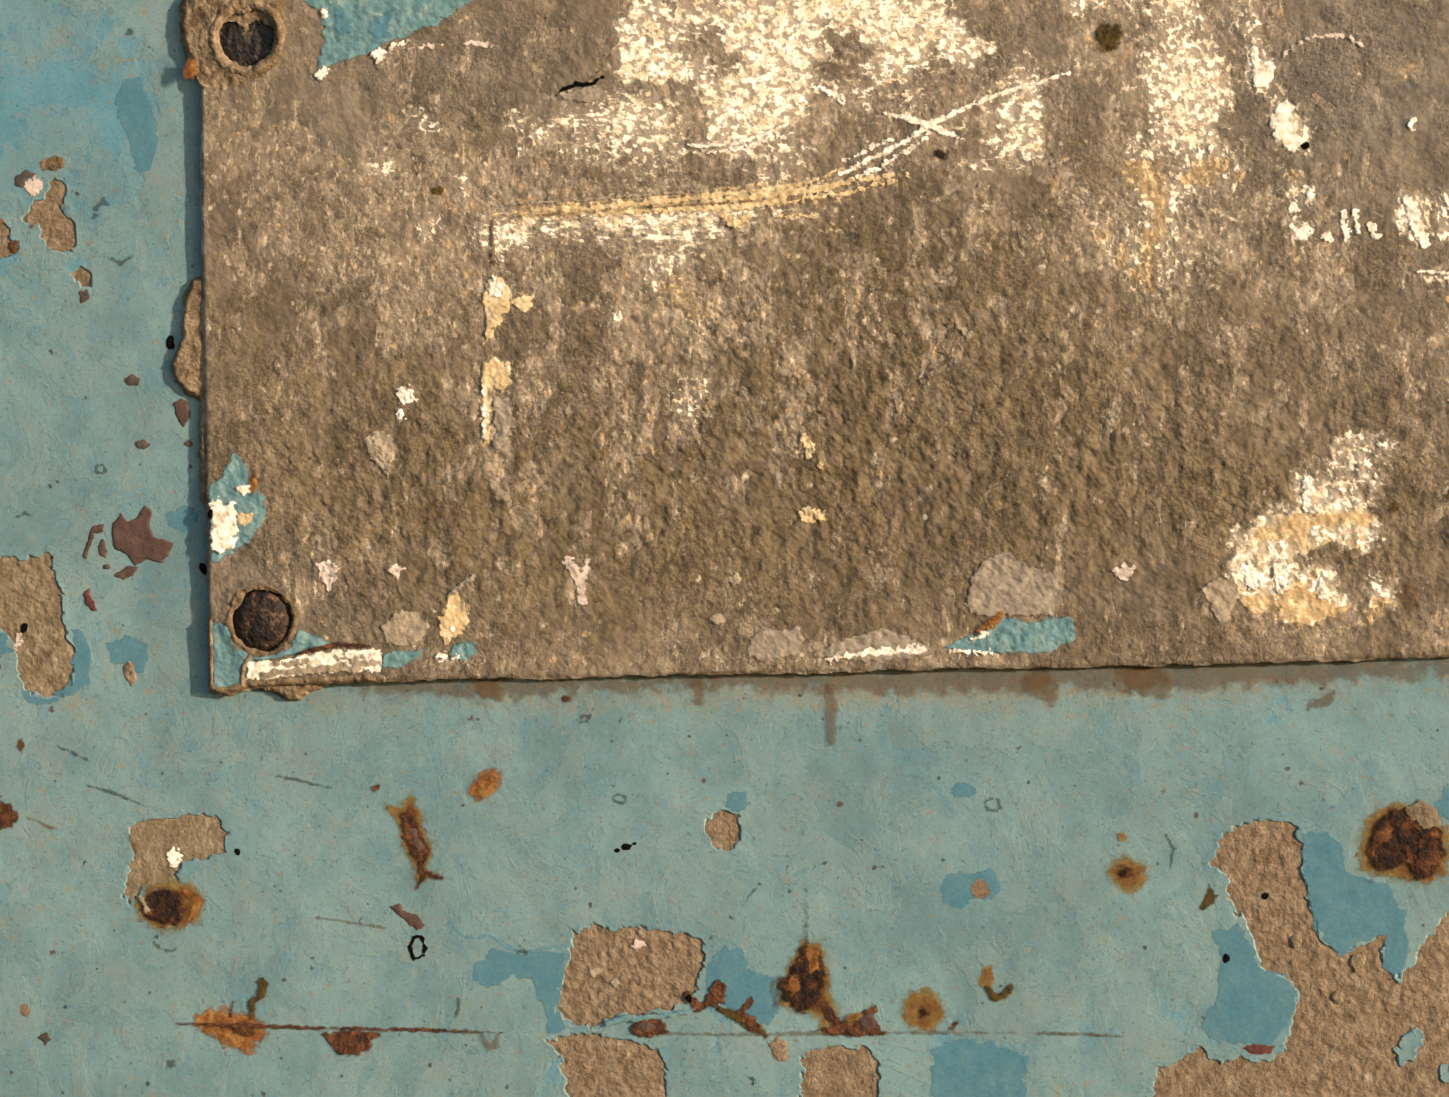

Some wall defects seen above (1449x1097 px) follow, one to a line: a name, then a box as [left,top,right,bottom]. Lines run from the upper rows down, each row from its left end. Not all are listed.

peeling [371,40,444,64]
peeling [463,40,493,48]
peeling [0,552,148,705]
peeling [123,812,240,904]
rust [388,796,443,889]
rust [1358,799,1449,883]
rust [134,881,204,930]
rust [195,977,269,1055]
peeling [473,924,881,1097]
rust [777,941,885,1037]
peeling [1153,819,1449,1097]